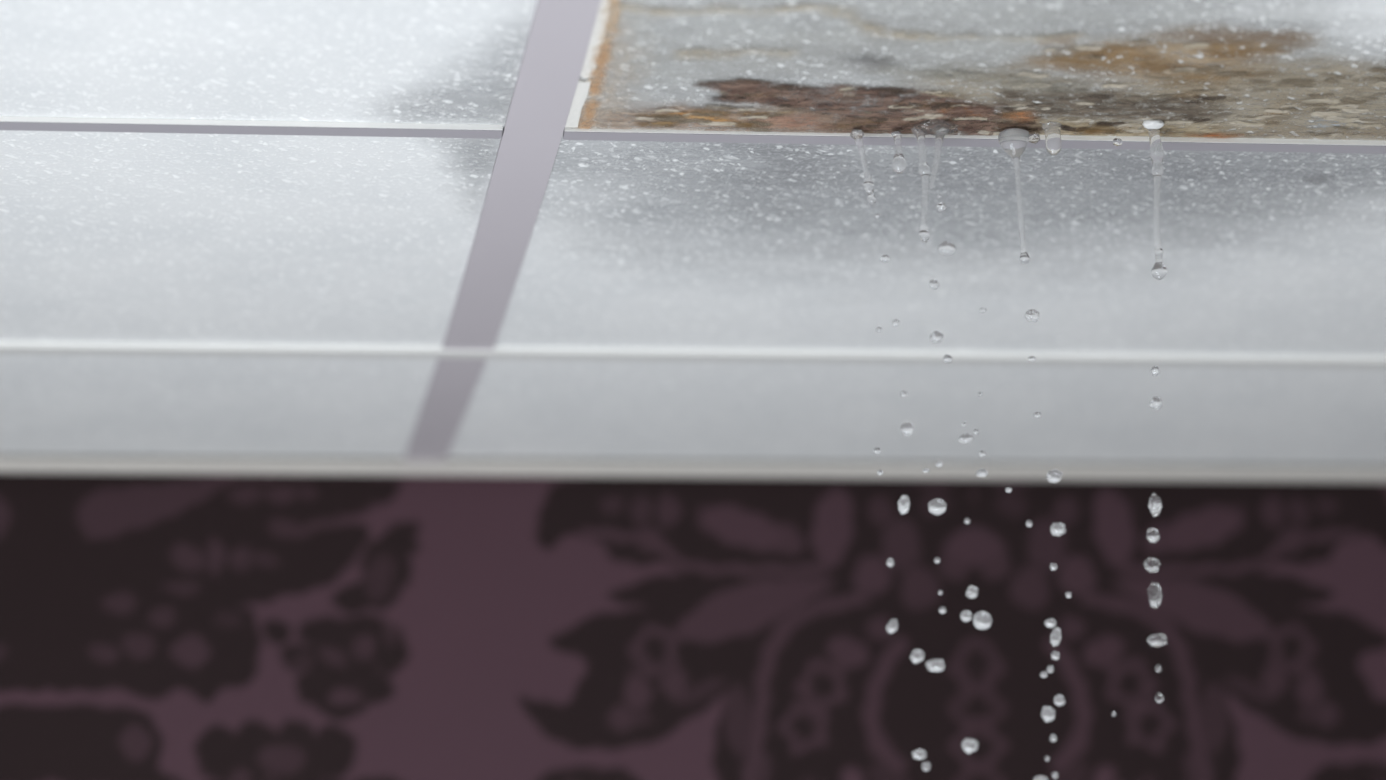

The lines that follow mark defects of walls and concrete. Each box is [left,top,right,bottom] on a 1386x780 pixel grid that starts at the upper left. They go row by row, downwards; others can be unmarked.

damp [578,0,1386,135]